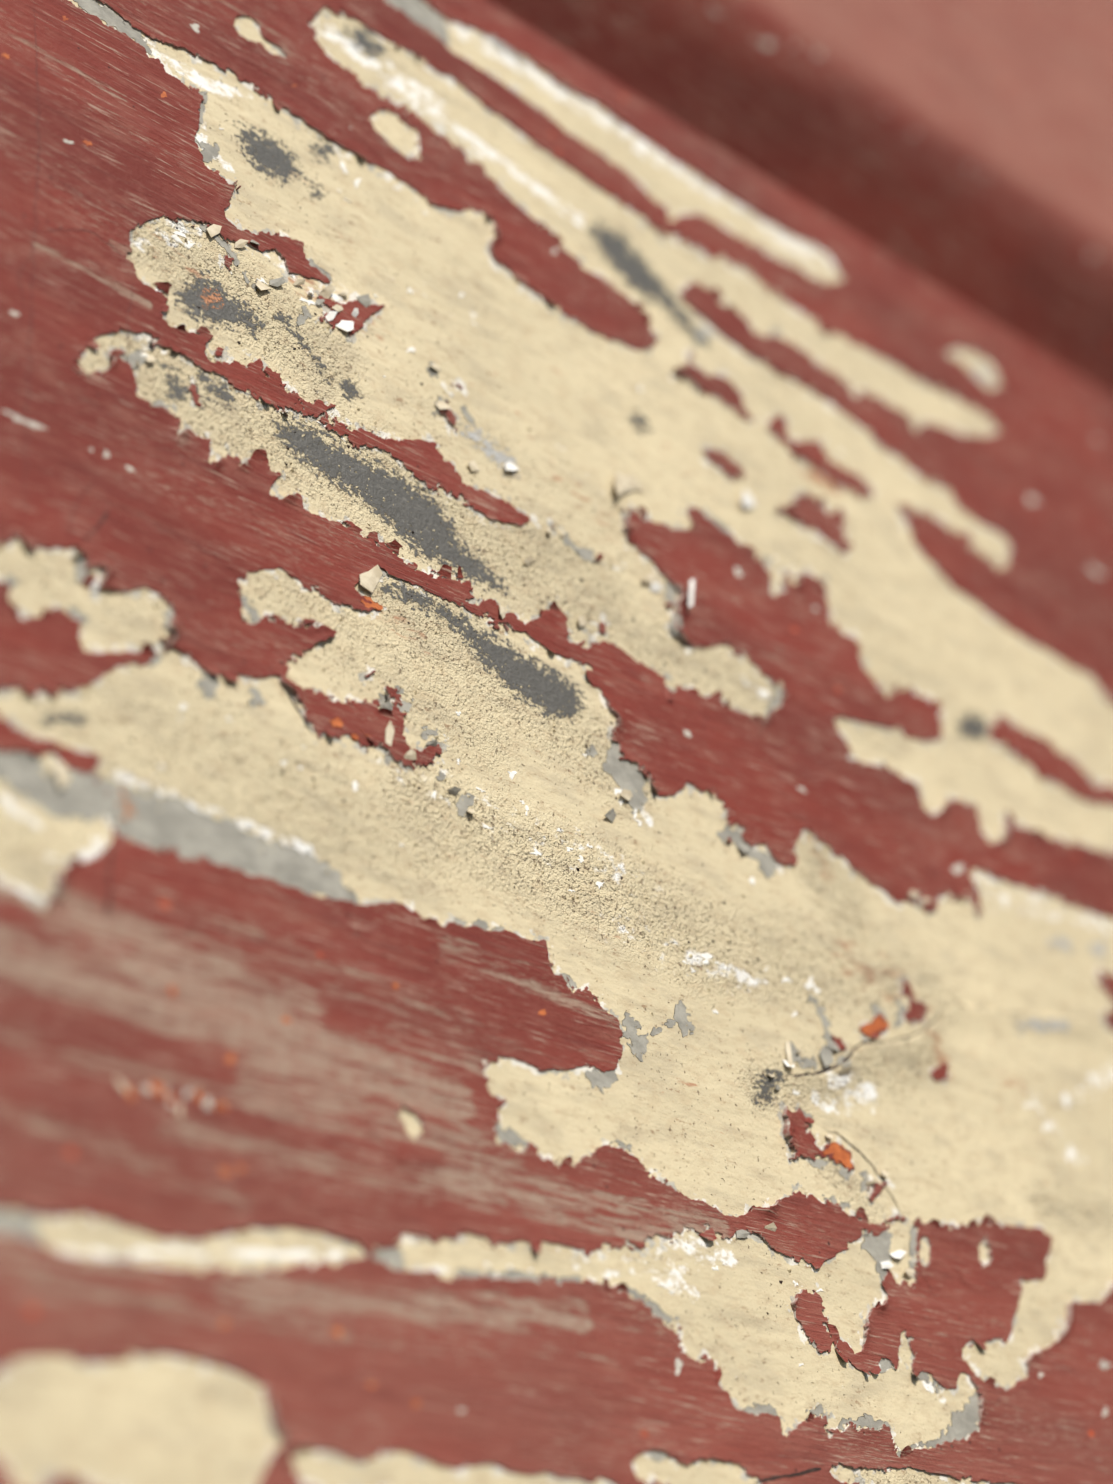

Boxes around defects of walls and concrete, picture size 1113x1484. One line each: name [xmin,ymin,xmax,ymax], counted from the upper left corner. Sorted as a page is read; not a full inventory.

peeling [0,298,1113,1484]
peeling [27,0,1113,874]